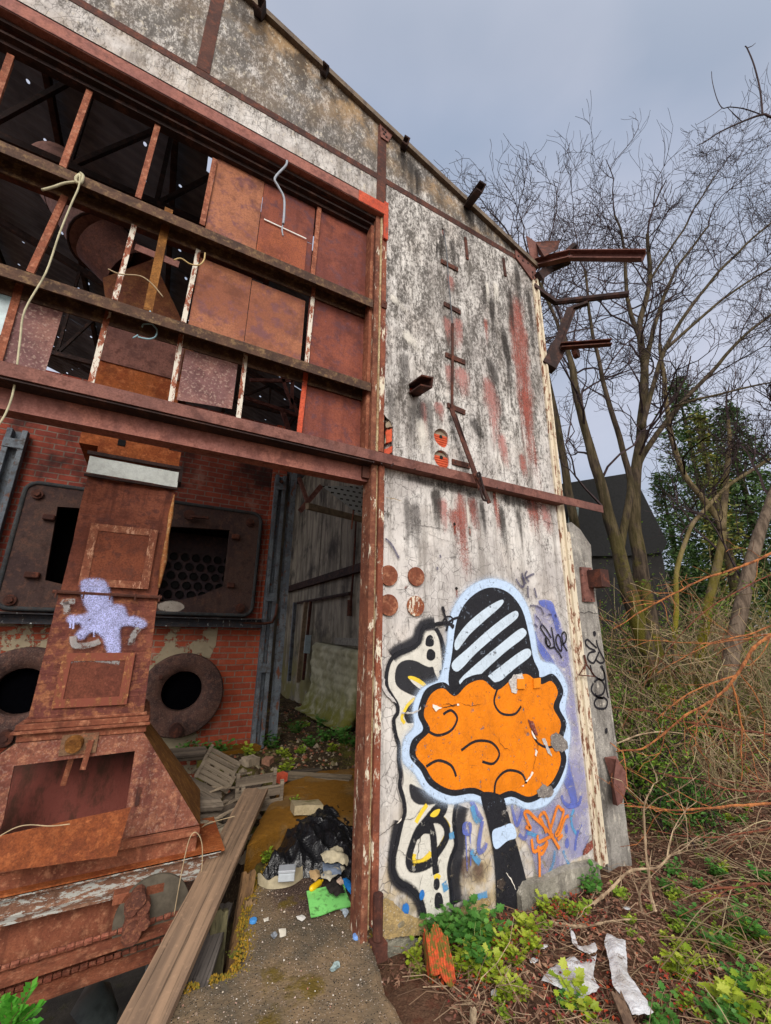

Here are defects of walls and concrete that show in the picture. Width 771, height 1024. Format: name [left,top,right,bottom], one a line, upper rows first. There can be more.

spalling [384,421,392,455]
rust [485,381,507,456]
rust [510,300,535,475]
damp [405,499,420,536]
rust [440,494,476,566]
damp [408,475,537,544]